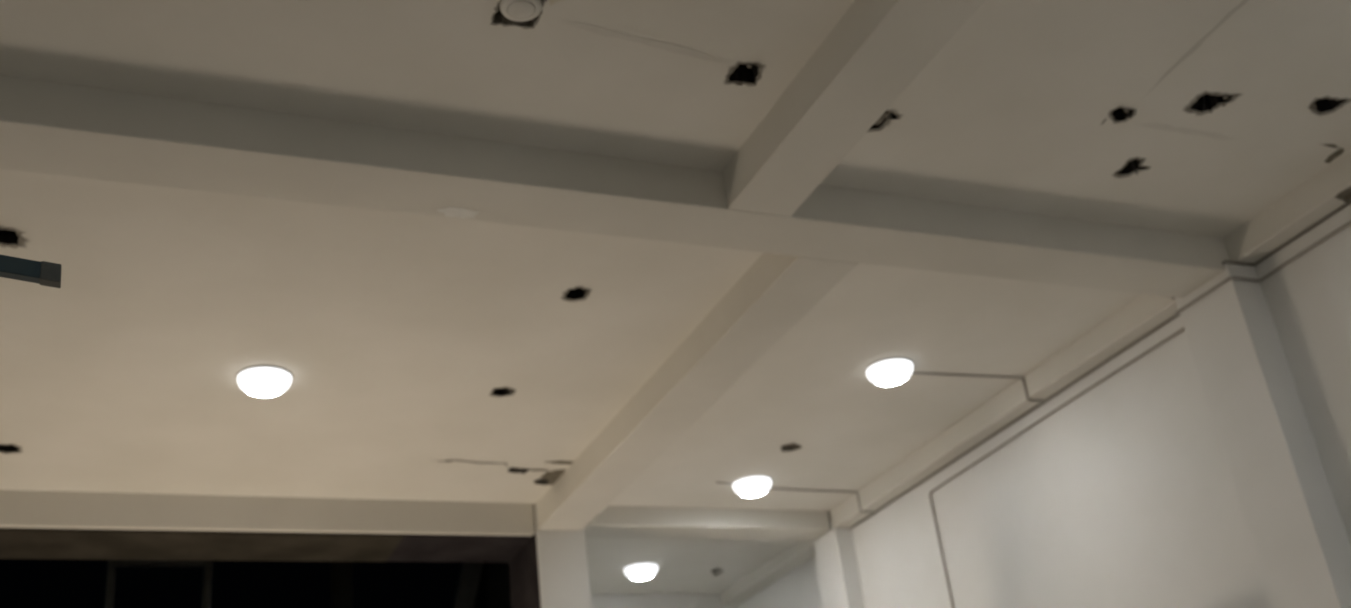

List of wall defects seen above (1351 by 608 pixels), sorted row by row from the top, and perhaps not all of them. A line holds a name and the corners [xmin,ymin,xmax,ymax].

flaking render [1317,143,1345,163]
flaking render [1333,187,1351,204]